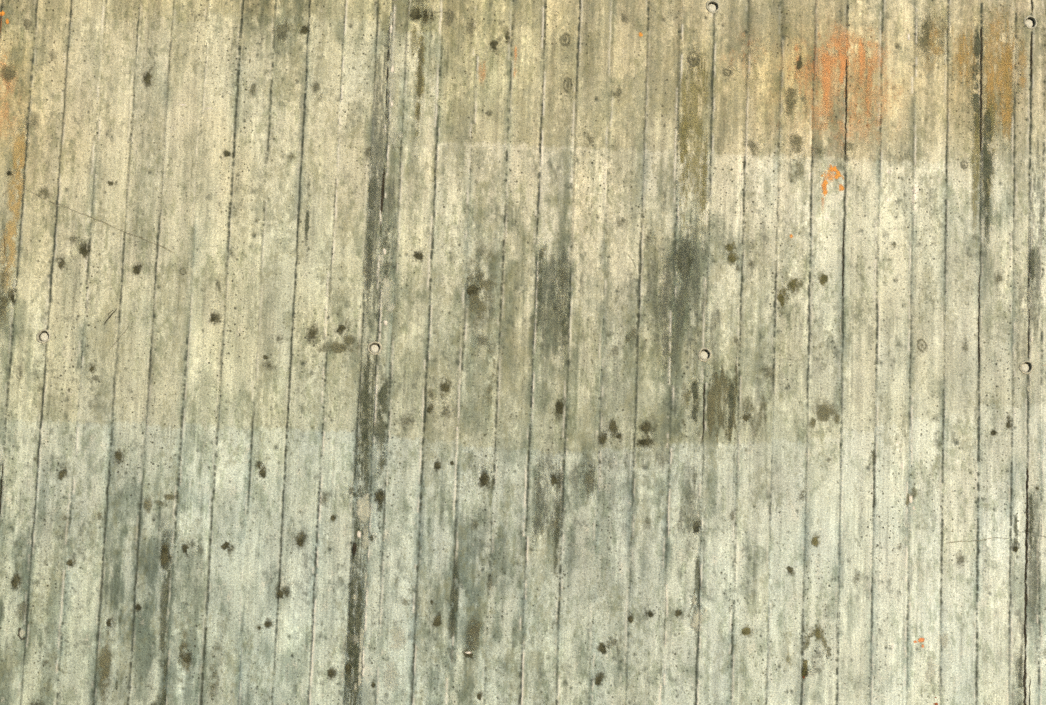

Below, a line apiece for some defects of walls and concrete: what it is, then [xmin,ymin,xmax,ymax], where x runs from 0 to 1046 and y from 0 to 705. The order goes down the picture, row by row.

rust [824,39,865,107]
rust [958,27,1025,235]
damp [365,59,395,310]
rust [821,165,844,196]
damp [308,325,354,353]
damp [536,248,568,346]
damp [663,242,699,327]
damp [683,366,766,442]
damp [328,356,388,705]